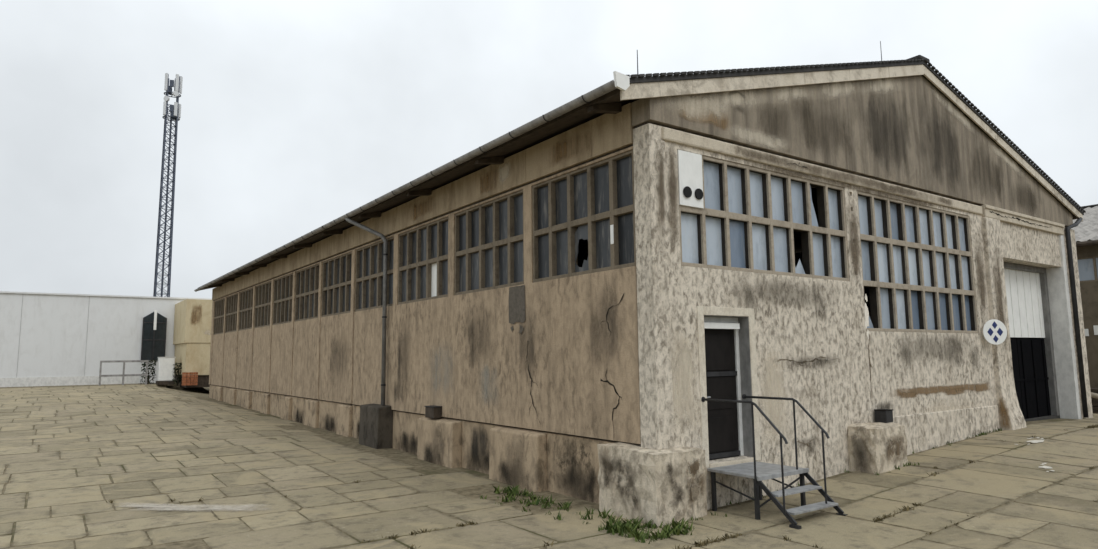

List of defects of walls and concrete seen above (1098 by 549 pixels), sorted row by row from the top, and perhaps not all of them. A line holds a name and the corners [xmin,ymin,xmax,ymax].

leakage [874,78,893,91]
leakage [679,91,753,125]
leakage [948,102,970,126]
leakage [739,130,926,205]
leakage [659,163,676,238]
crack [600,371,622,430]
leakage [402,434,440,464]
leakage [473,430,489,468]